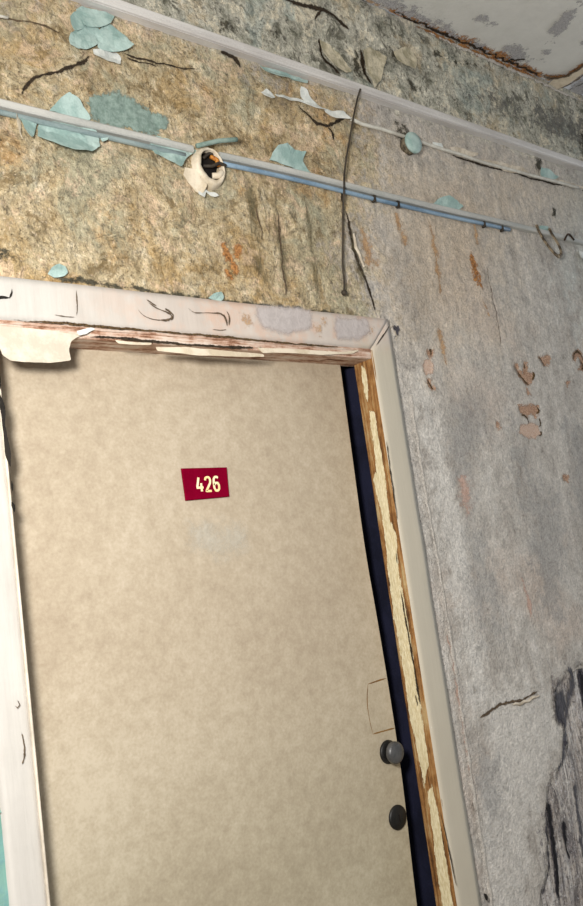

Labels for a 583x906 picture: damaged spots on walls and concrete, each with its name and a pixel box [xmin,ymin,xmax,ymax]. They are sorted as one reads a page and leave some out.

crack [21,56,89,94]
peeling [69,6,134,64]
crack [124,53,194,70]
crack [286,0,349,73]
peeling [363,47,417,87]
corrosion [366,0,583,82]
crack [395,12,583,90]
peeling [17,92,108,151]
leakage [531,100,583,152]
corrosion [221,242,242,280]
peeling [0,306,373,363]
spalling [536,658,583,906]